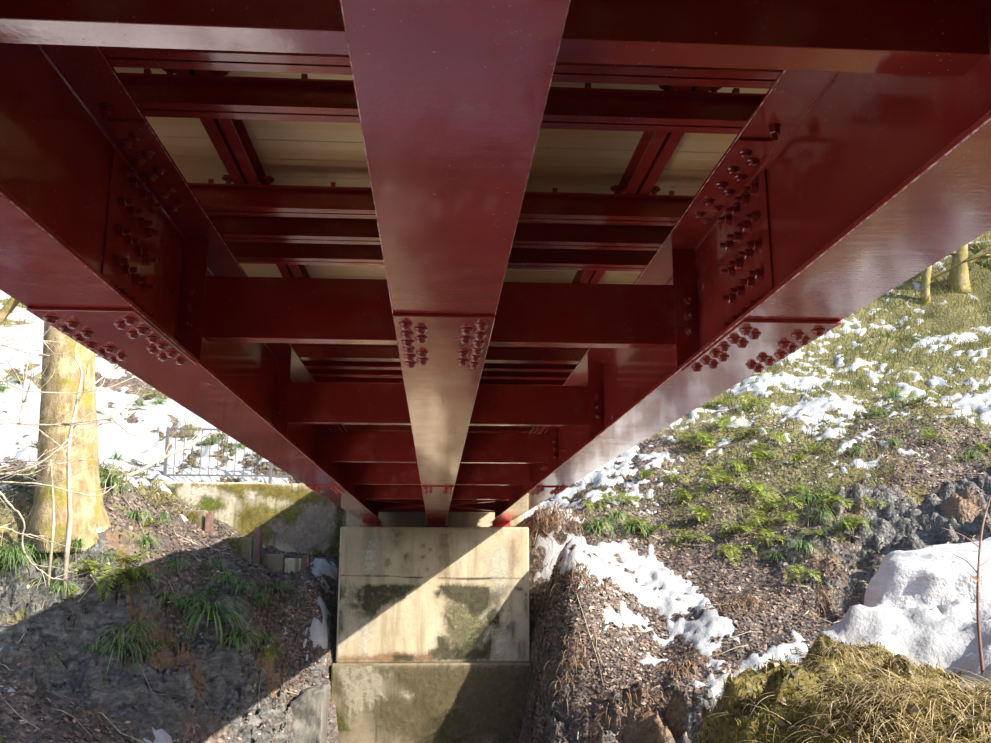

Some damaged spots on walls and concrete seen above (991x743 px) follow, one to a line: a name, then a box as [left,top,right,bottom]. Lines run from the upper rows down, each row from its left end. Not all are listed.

leakage [335,534,530,743]